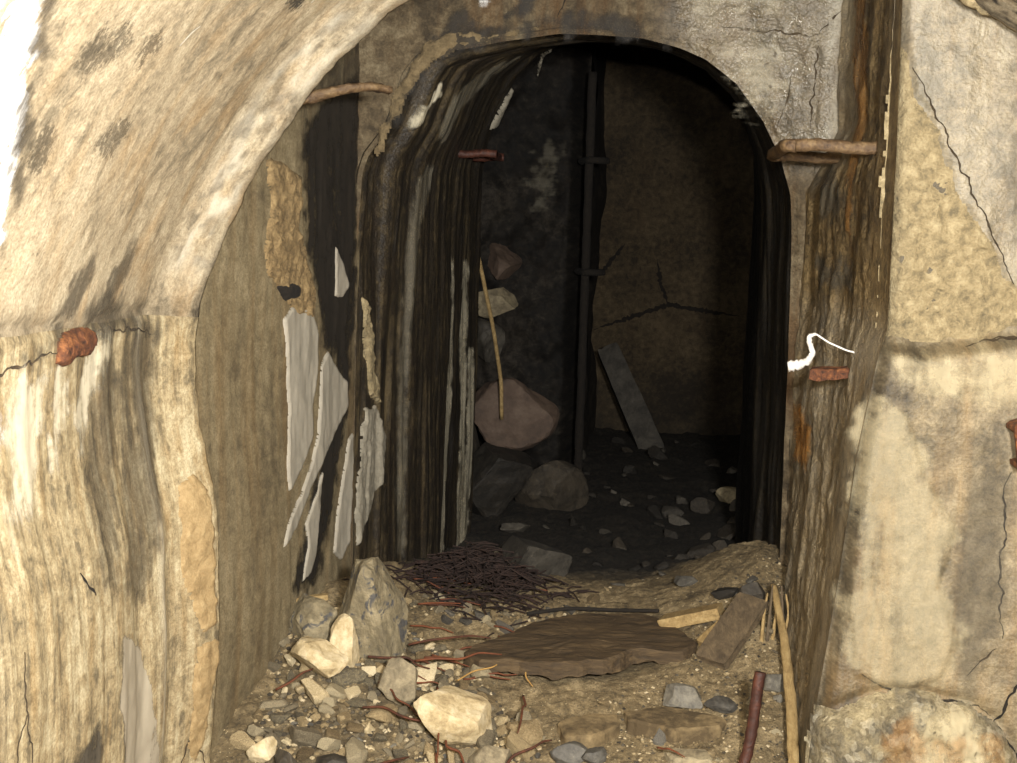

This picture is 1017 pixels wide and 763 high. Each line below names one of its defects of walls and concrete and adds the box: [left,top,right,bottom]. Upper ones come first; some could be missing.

spalling [875,30,1017,343]
crack [913,68,1014,284]
crack [0,352,58,377]
crack [92,325,151,335]
peeling [264,158,350,581]
peeling [333,298,386,560]
crack [966,335,1017,347]
crack [967,472,1012,676]
crack [943,685,1017,758]